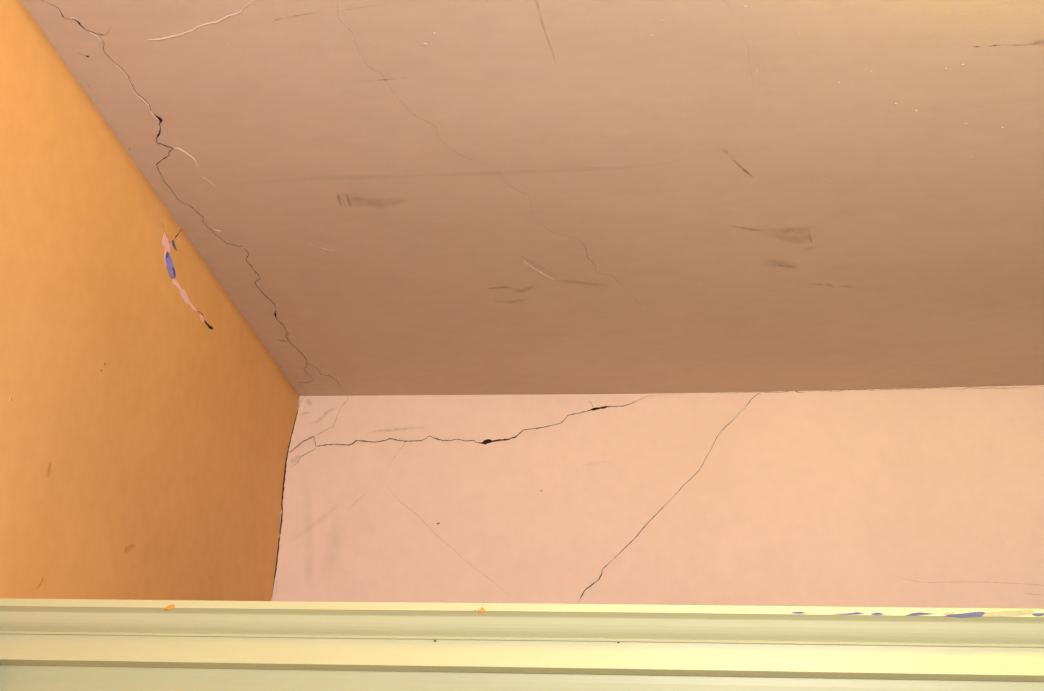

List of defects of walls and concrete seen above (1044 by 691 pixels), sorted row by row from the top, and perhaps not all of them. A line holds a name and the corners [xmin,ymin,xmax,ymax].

peeling [162,233,213,330]
crack [42,0,636,589]
crack [580,391,799,599]